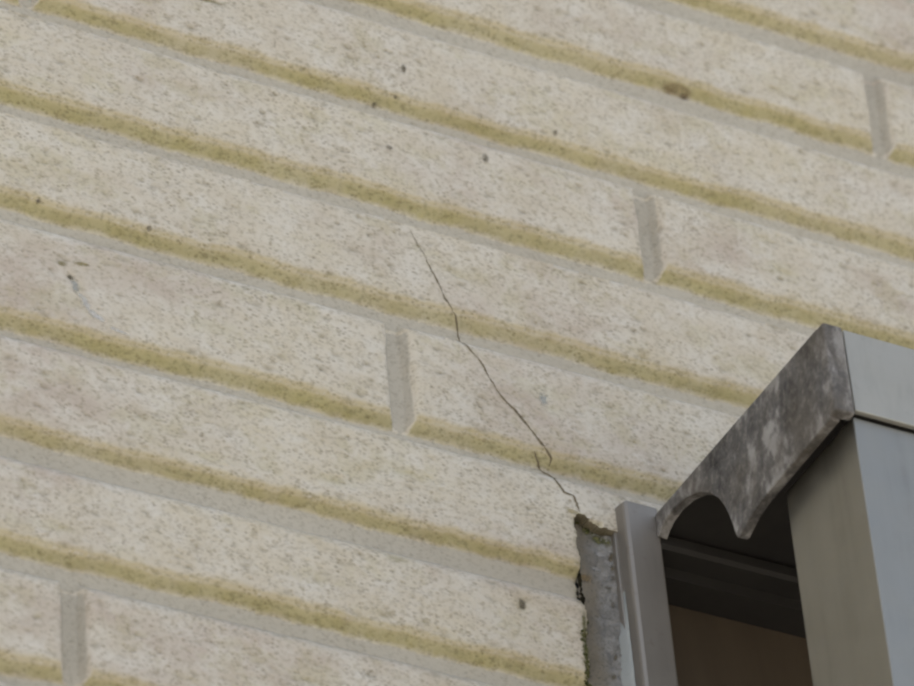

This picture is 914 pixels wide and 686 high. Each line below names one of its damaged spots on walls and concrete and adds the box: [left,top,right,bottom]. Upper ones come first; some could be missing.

crack [410,231,580,512]